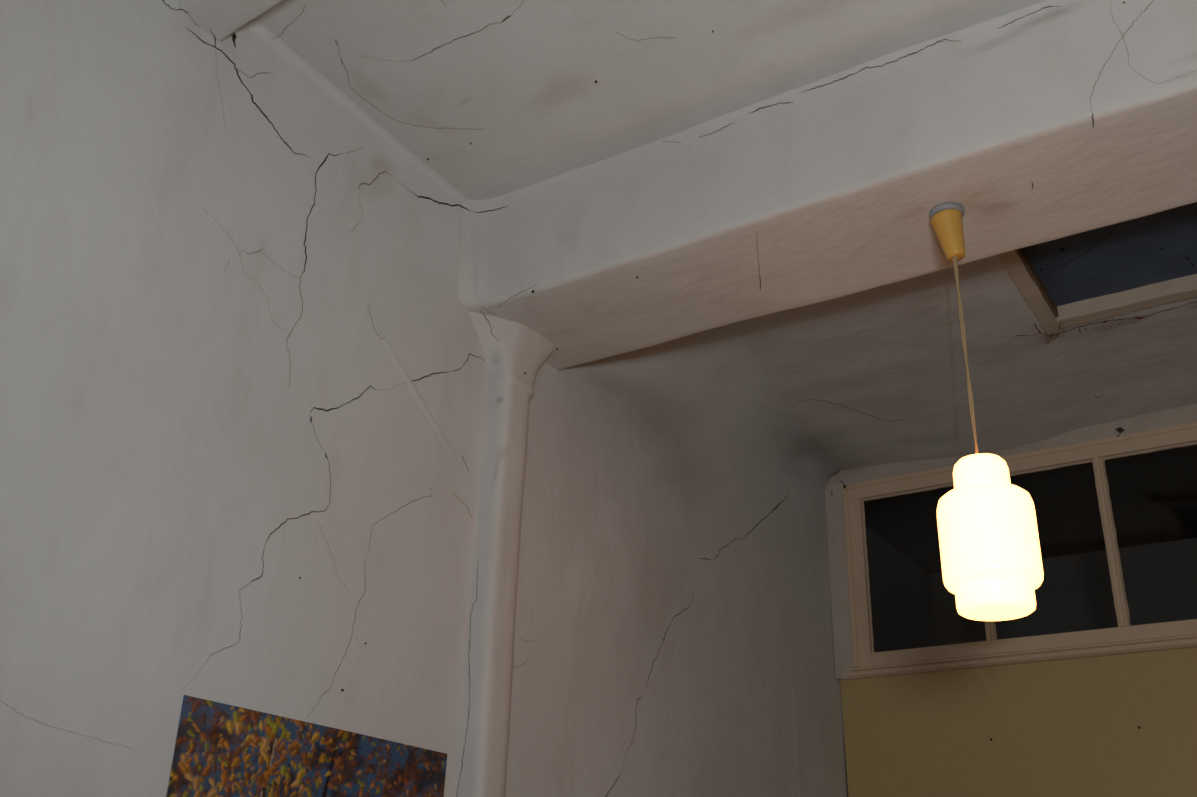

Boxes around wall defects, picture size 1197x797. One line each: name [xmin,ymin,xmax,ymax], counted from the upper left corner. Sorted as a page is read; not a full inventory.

crack [667,39,957,143]
crack [997,6,1059,29]
crack [1090,0,1197,128]
crack [162,0,361,386]
crack [346,171,507,232]
crack [184,286,533,718]
crack [700,486,794,560]
crack [605,596,693,797]